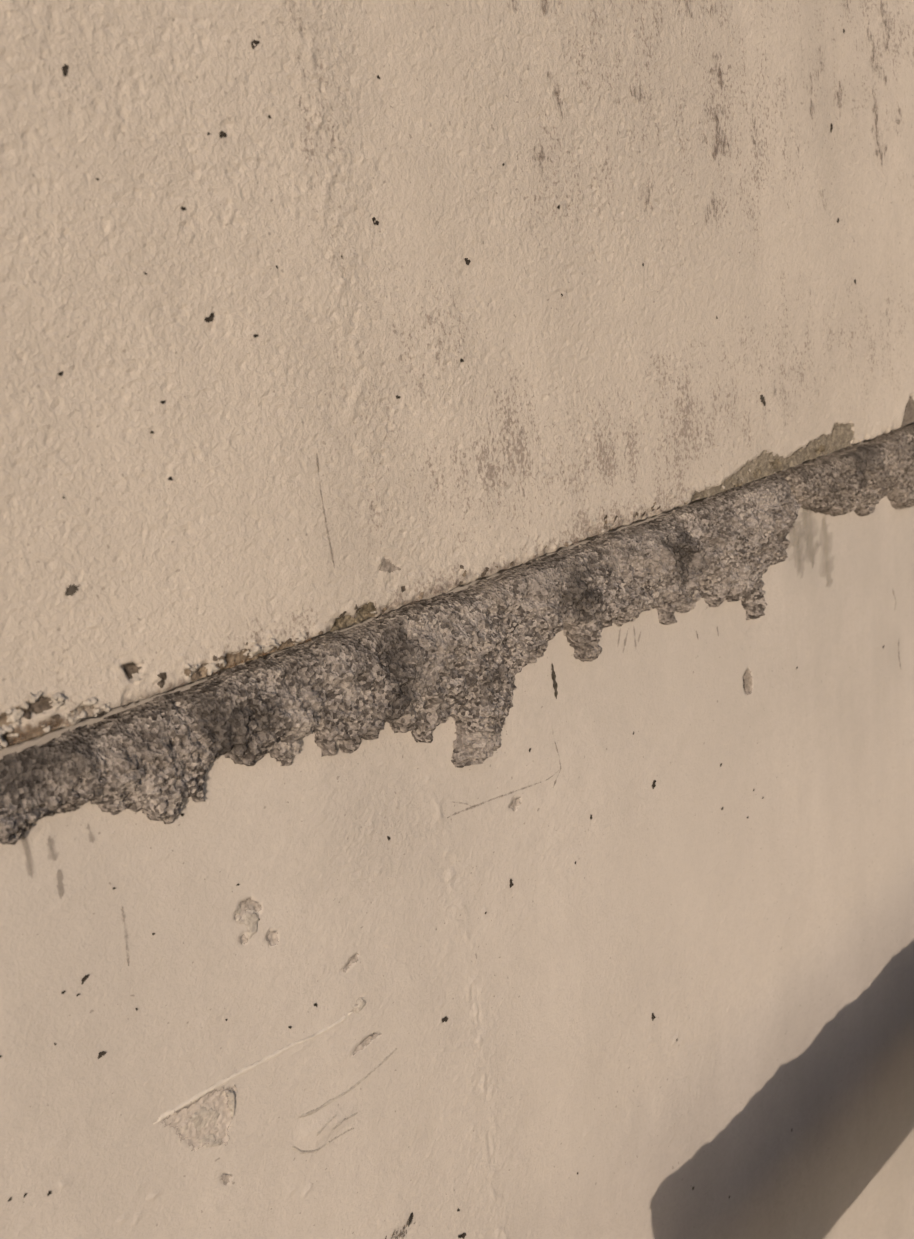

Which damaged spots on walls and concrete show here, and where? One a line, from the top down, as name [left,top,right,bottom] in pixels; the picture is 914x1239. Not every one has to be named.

peeling [901,396,914,427]
peeling [590,422,855,534]
peeling [379,559,401,573]
spalling [459,562,514,585]
spalling [183,602,387,682]
spalling [123,662,167,688]
crack [550,663,558,699]
peeling [743,669,753,695]
spalling [0,690,110,750]